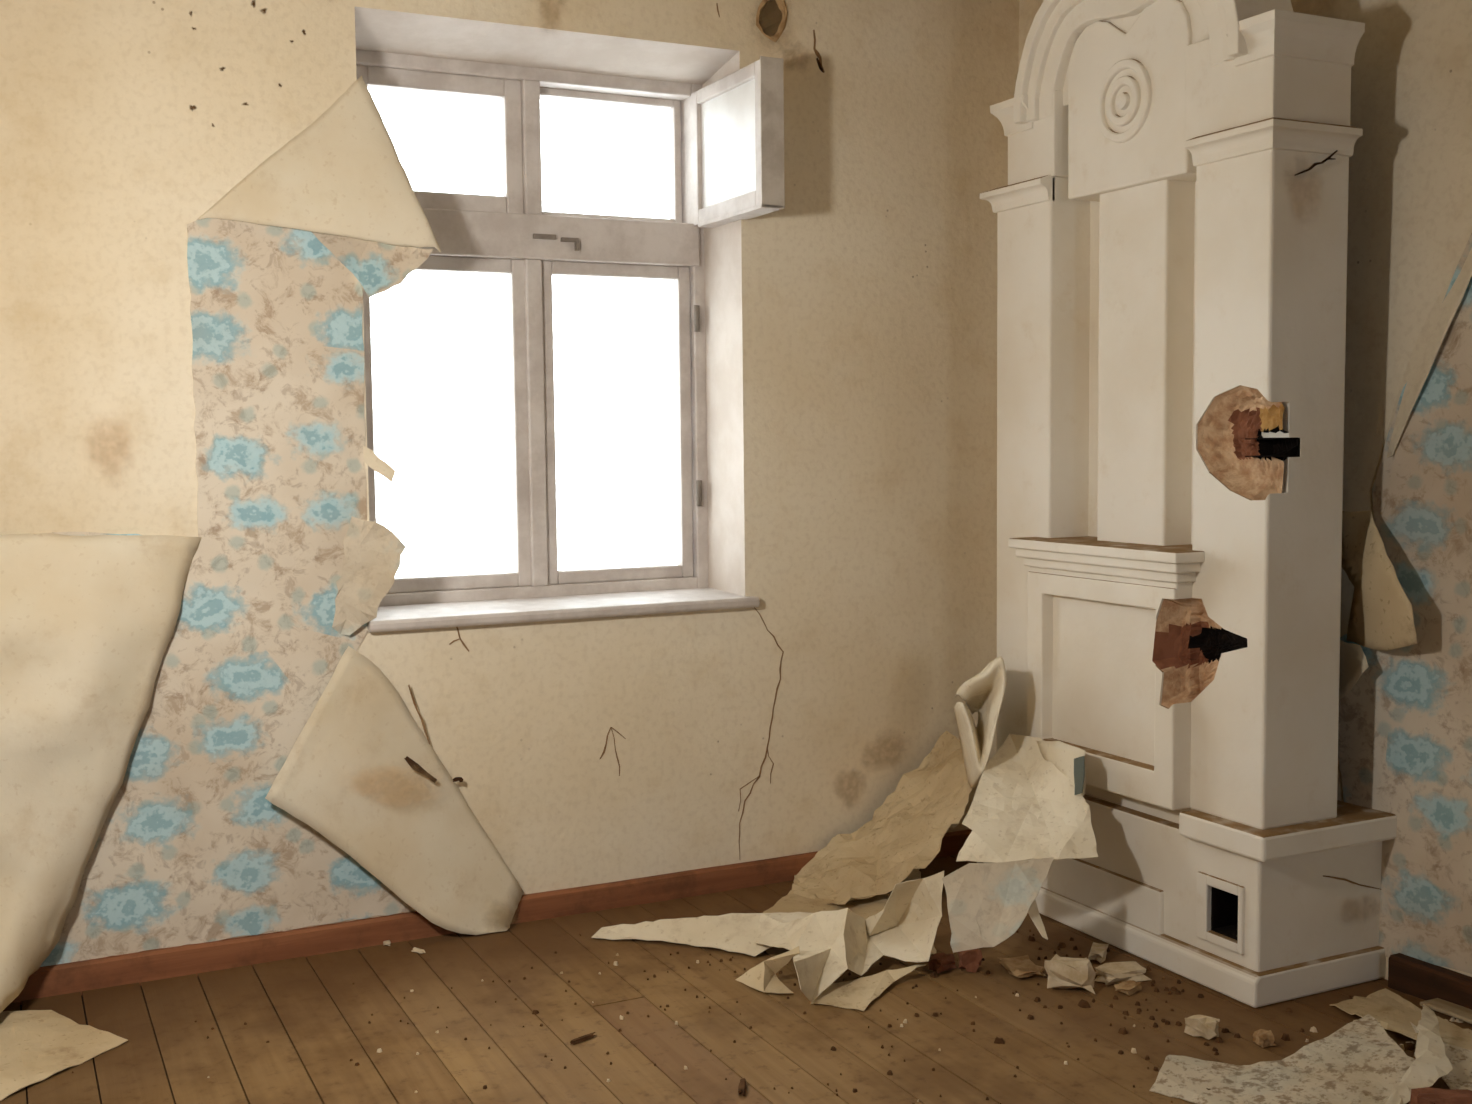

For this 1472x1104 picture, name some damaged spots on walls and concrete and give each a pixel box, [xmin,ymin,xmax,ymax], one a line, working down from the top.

crack [1295,150,1338,176]
spalling [1197,385,1300,500]
spalling [1152,598,1248,708]
crack [738,607,784,857]
spalling [1409,1087,1472,1104]